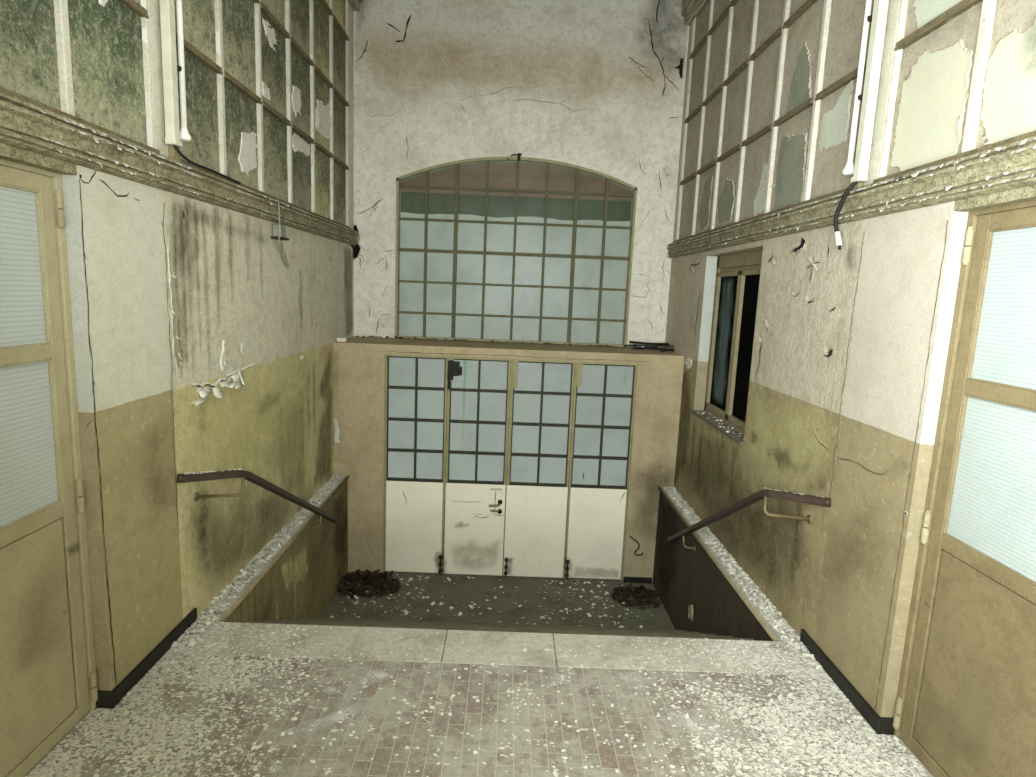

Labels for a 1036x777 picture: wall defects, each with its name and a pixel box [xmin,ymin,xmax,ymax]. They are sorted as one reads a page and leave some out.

peeling [238,132,261,175]
peeling [262,18,277,51]
peeling [291,85,301,117]
peeling [292,133,310,156]
peeling [315,99,332,139]
crack [357,0,680,118]
peeling [785,41,812,114]
peeling [753,80,854,216]
peeling [908,0,974,29]
peeling [890,18,1036,172]
peeling [190,340,255,406]
damp [282,549,307,619]